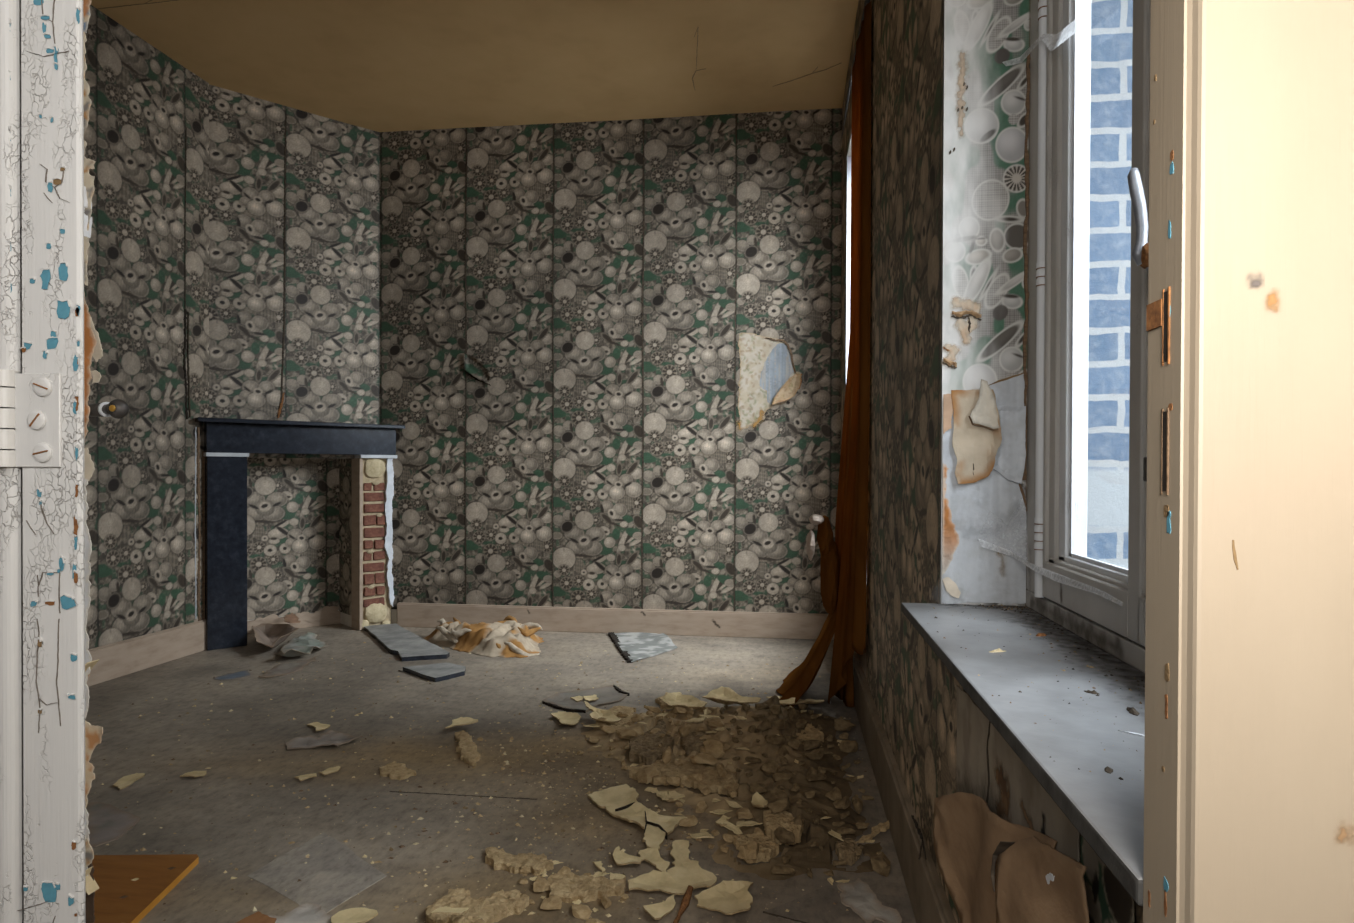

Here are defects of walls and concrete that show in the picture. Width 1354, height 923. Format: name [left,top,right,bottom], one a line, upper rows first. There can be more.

peeling [33,0,59,70]
crack [25,0,69,57]
crack [40,164,70,203]
peeling [46,166,65,192]
peeling [20,262,81,359]
peeling [72,338,81,371]
flaking render [759,343,794,404]
peeling [942,379,1002,598]
spalling [995,765,1045,834]